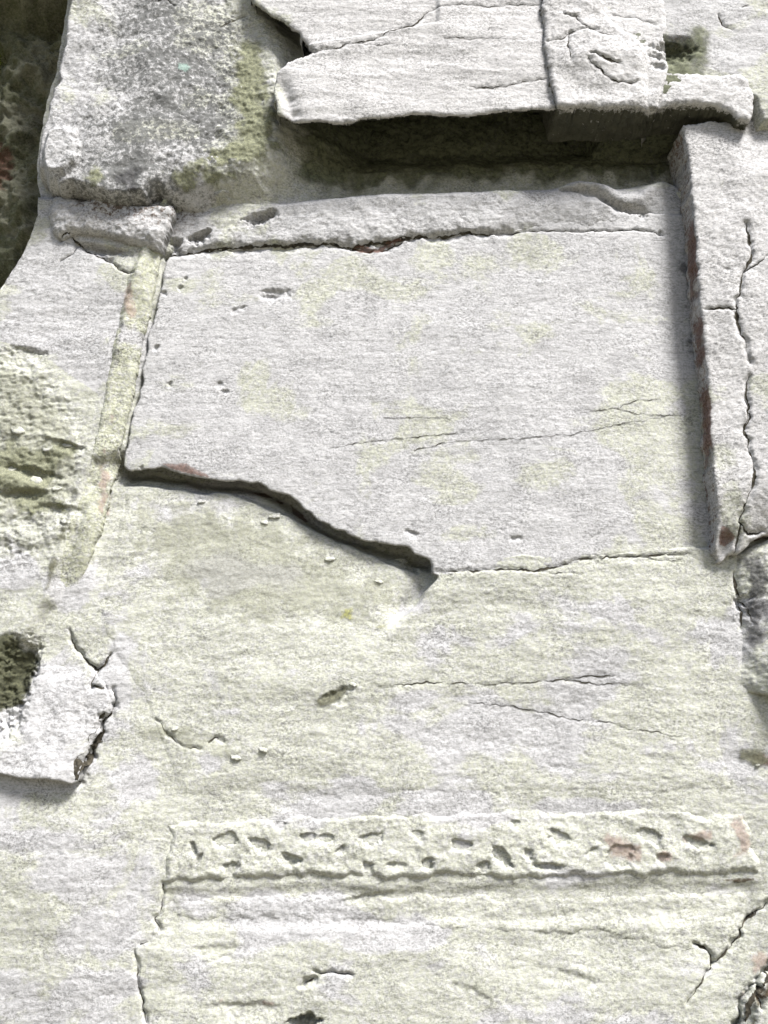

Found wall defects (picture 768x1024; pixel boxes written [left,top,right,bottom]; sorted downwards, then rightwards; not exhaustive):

crack [317,4,523,52]
crack [172,229,663,257]
crack [329,399,668,451]
crack [705,224,764,626]
crack [434,553,687,574]
peeling [0,658,114,784]
crack [394,675,682,736]
crack [687,902,767,1002]
crack [744,967,768,1022]